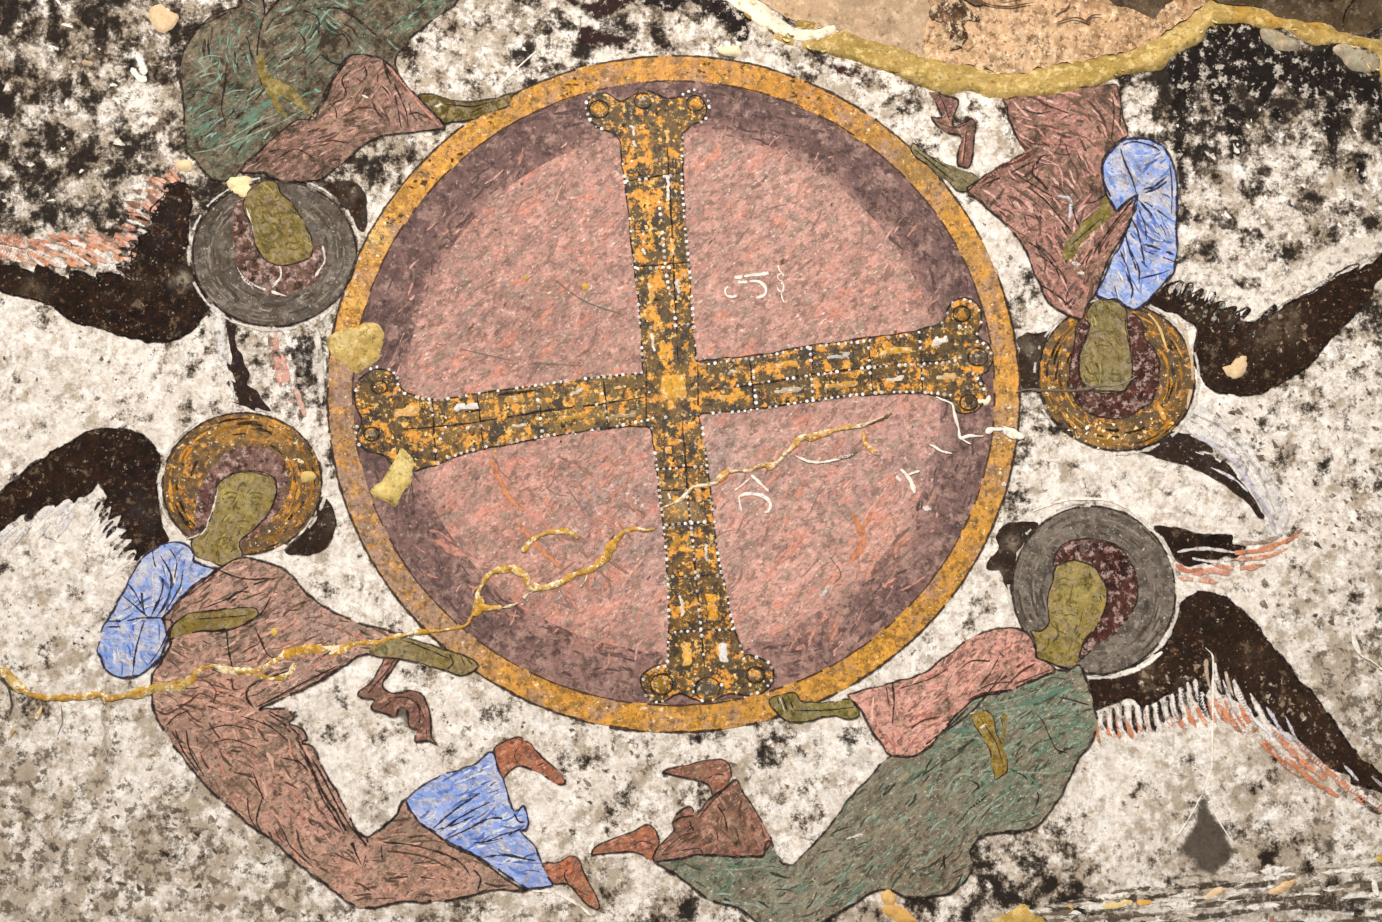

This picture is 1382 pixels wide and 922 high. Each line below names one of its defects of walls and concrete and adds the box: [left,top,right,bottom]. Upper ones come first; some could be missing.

peeling [522,40,577,79]
spalling [759,0,1210,74]
leakage [1167,23,1382,201]
peeling [1260,183,1292,224]
crack [1016,376,1136,393]
crack [0,396,1024,758]